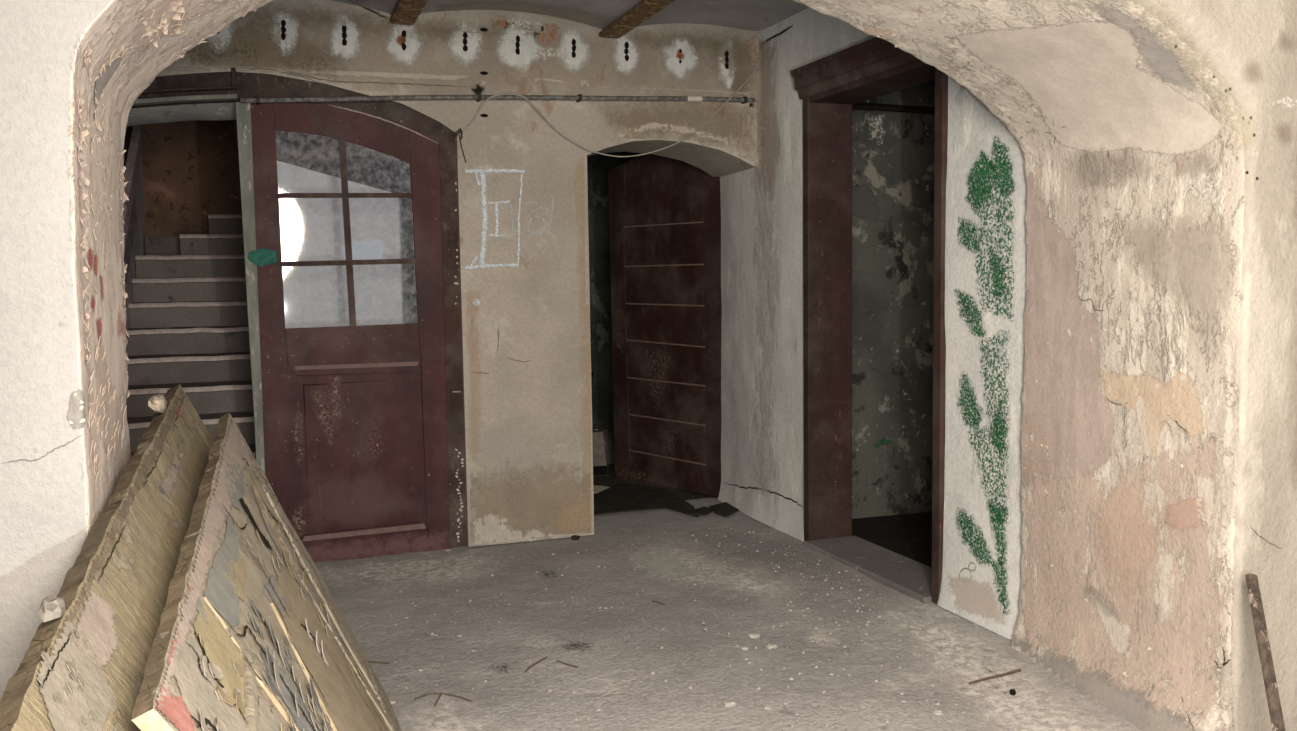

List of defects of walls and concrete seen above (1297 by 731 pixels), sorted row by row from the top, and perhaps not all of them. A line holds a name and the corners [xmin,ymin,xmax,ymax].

peeling [1087,4,1193,89]
peeling [66,0,269,485]
crack [1,434,84,464]
peeling [1021,171,1233,730]
water stain [470,465,591,539]
crack [724,482,804,508]